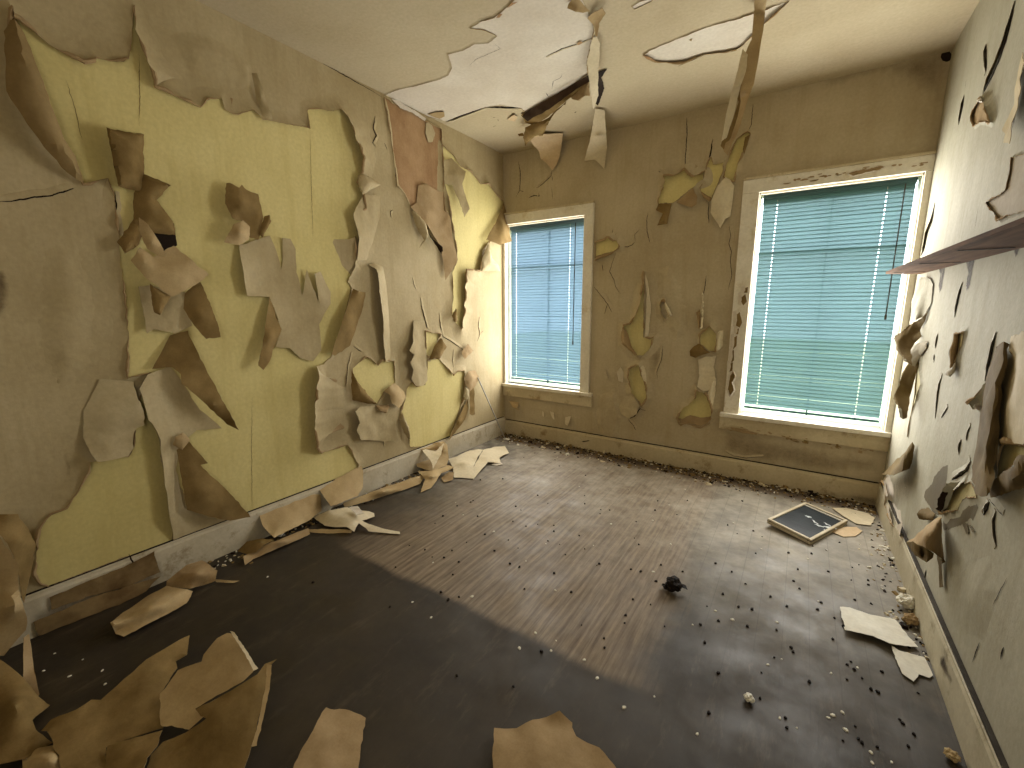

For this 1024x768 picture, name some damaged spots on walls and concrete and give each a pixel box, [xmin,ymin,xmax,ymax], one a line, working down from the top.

peeling [631,0,653,10]
crack [0,182,76,202]
peeling [0,0,607,636]
peeling [594,228,640,261]
peeling [617,270,672,361]
peeling [672,275,748,429]
peeling [641,0,791,228]
peeling [783,162,928,184]
peeling [970,52,1024,224]
peeling [880,277,1024,588]